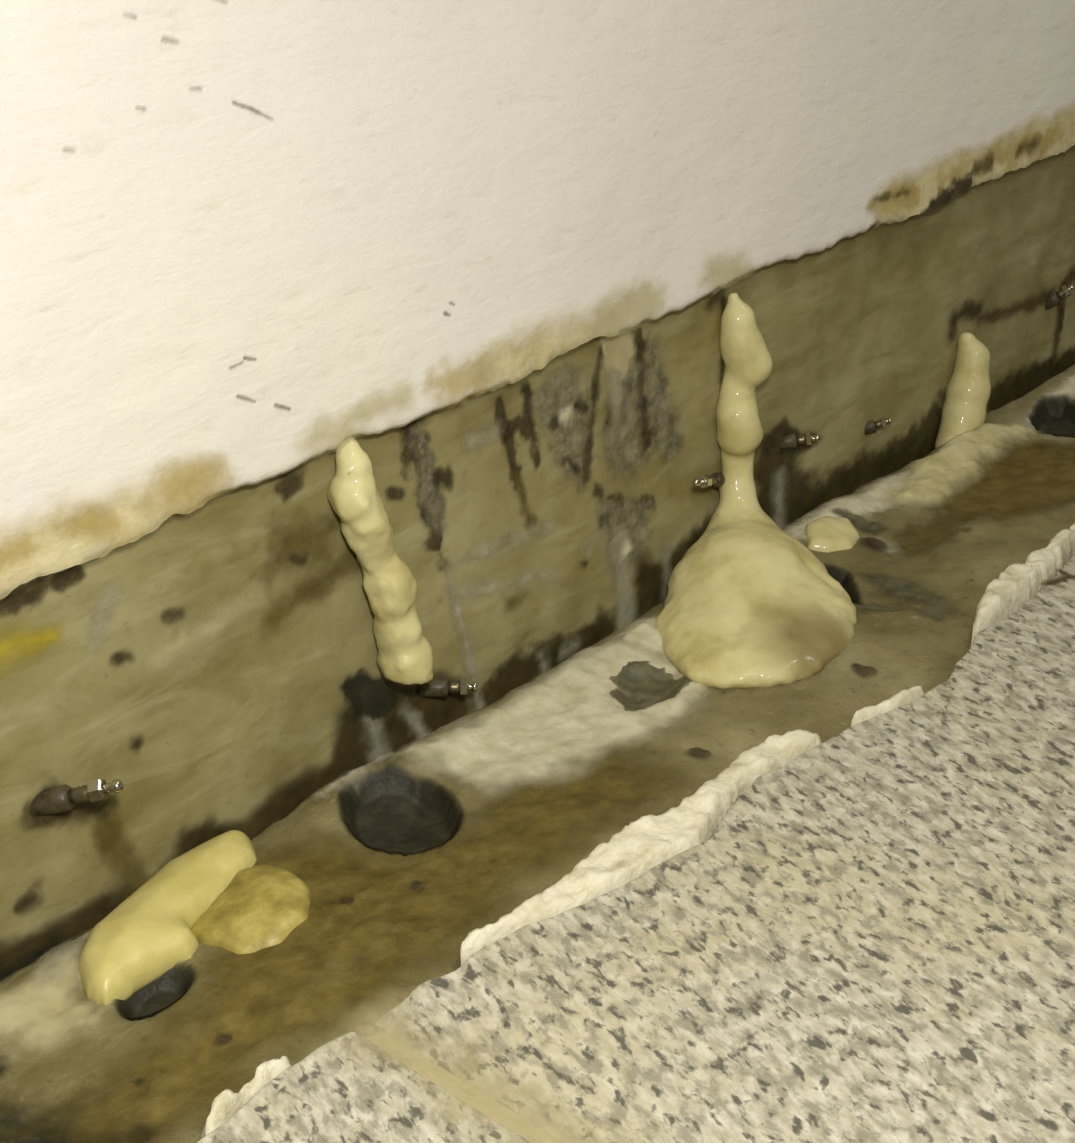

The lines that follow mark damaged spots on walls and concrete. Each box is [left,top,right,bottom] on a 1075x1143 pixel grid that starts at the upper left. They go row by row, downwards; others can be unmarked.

flaking render [872,107,1075,221]
water stain [444,286,659,393]
water stain [988,349,1075,411]
peeling [0,464,215,595]
flaking render [276,473,303,500]
spalling [402,418,453,551]
spalling [496,327,681,568]
water stain [754,392,1075,553]
spalling [971,523,1075,646]
spalling [851,685,926,726]
water stain [0,520,710,1143]
spalling [460,729,822,966]